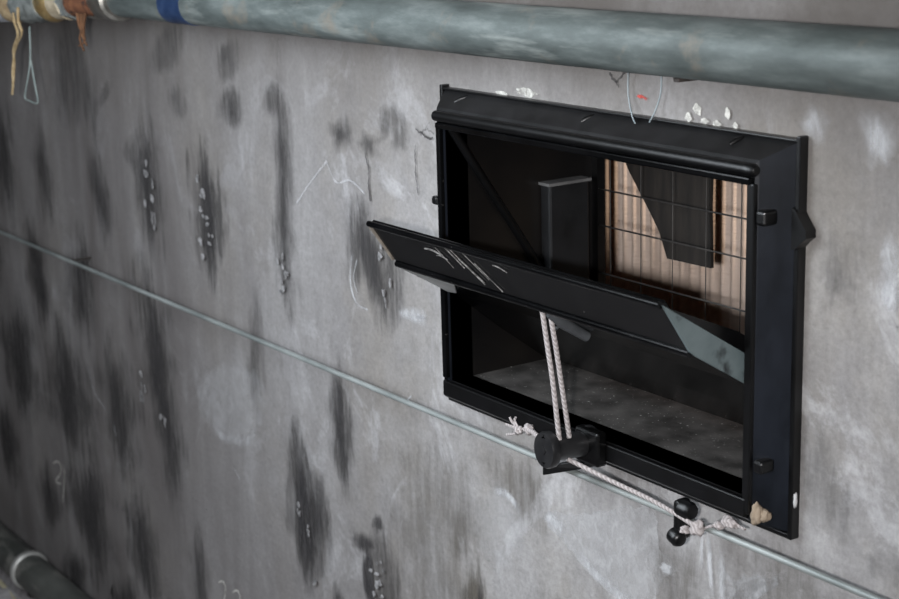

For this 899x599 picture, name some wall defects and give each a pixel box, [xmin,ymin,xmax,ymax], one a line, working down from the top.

water stain [28,230,44,311]
water stain [130,143,161,237]
water stain [196,147,222,285]
water stain [350,217,401,318]
water stain [48,321,93,446]
water stain [105,286,180,483]
water stain [289,421,329,586]
water stain [355,536,398,599]